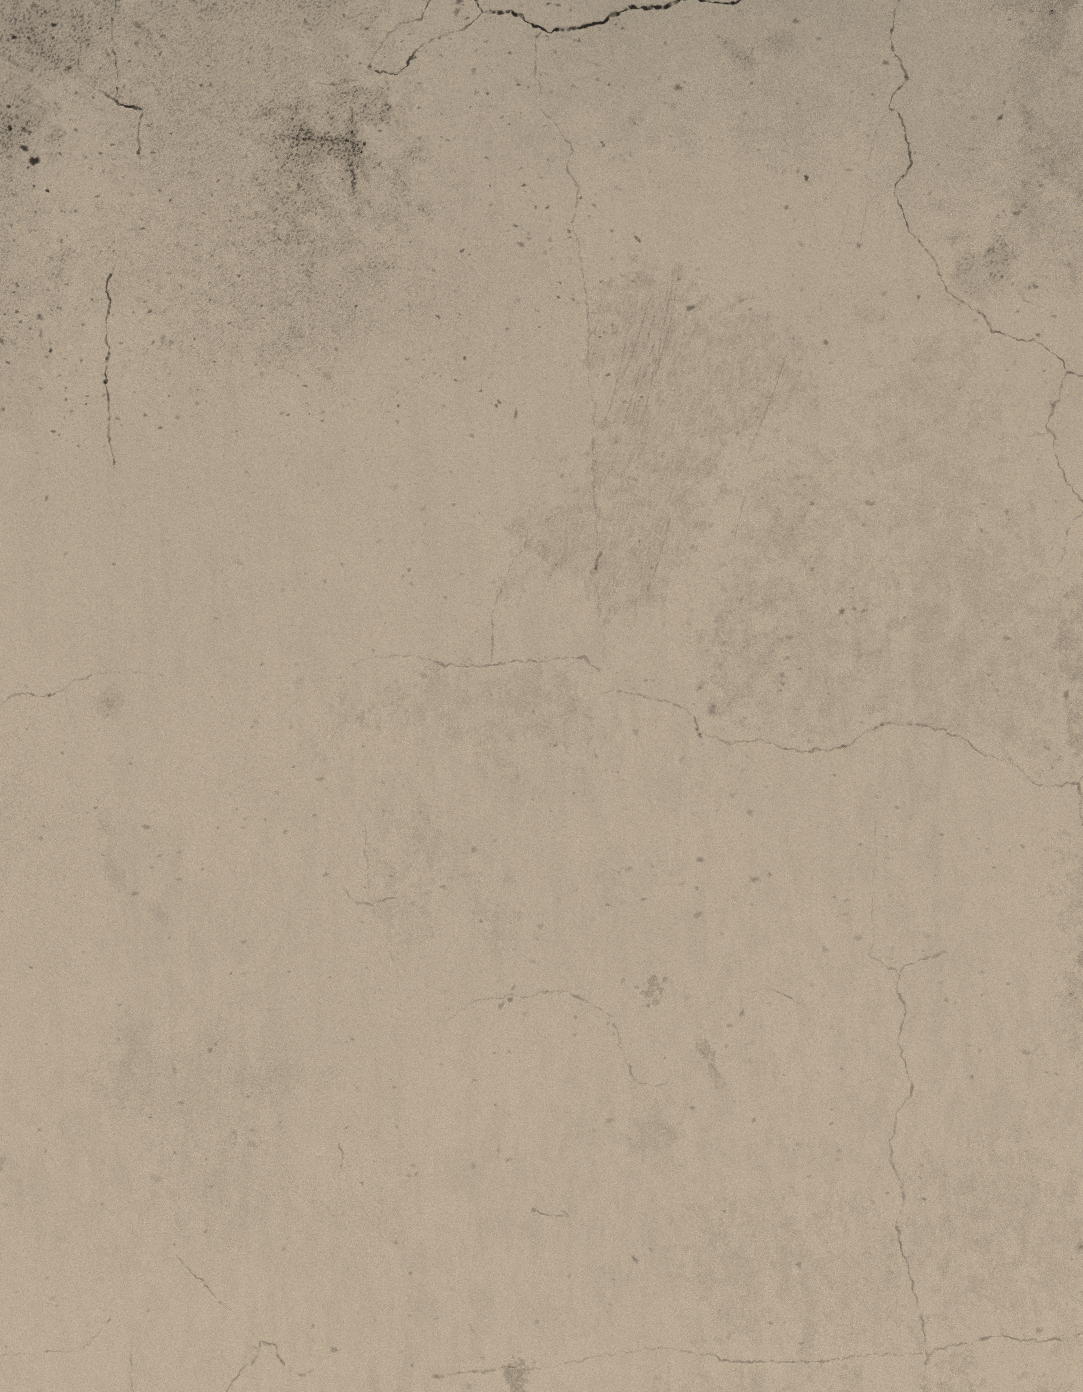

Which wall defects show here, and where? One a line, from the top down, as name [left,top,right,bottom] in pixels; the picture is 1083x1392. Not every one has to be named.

crack [469,0,741,33]